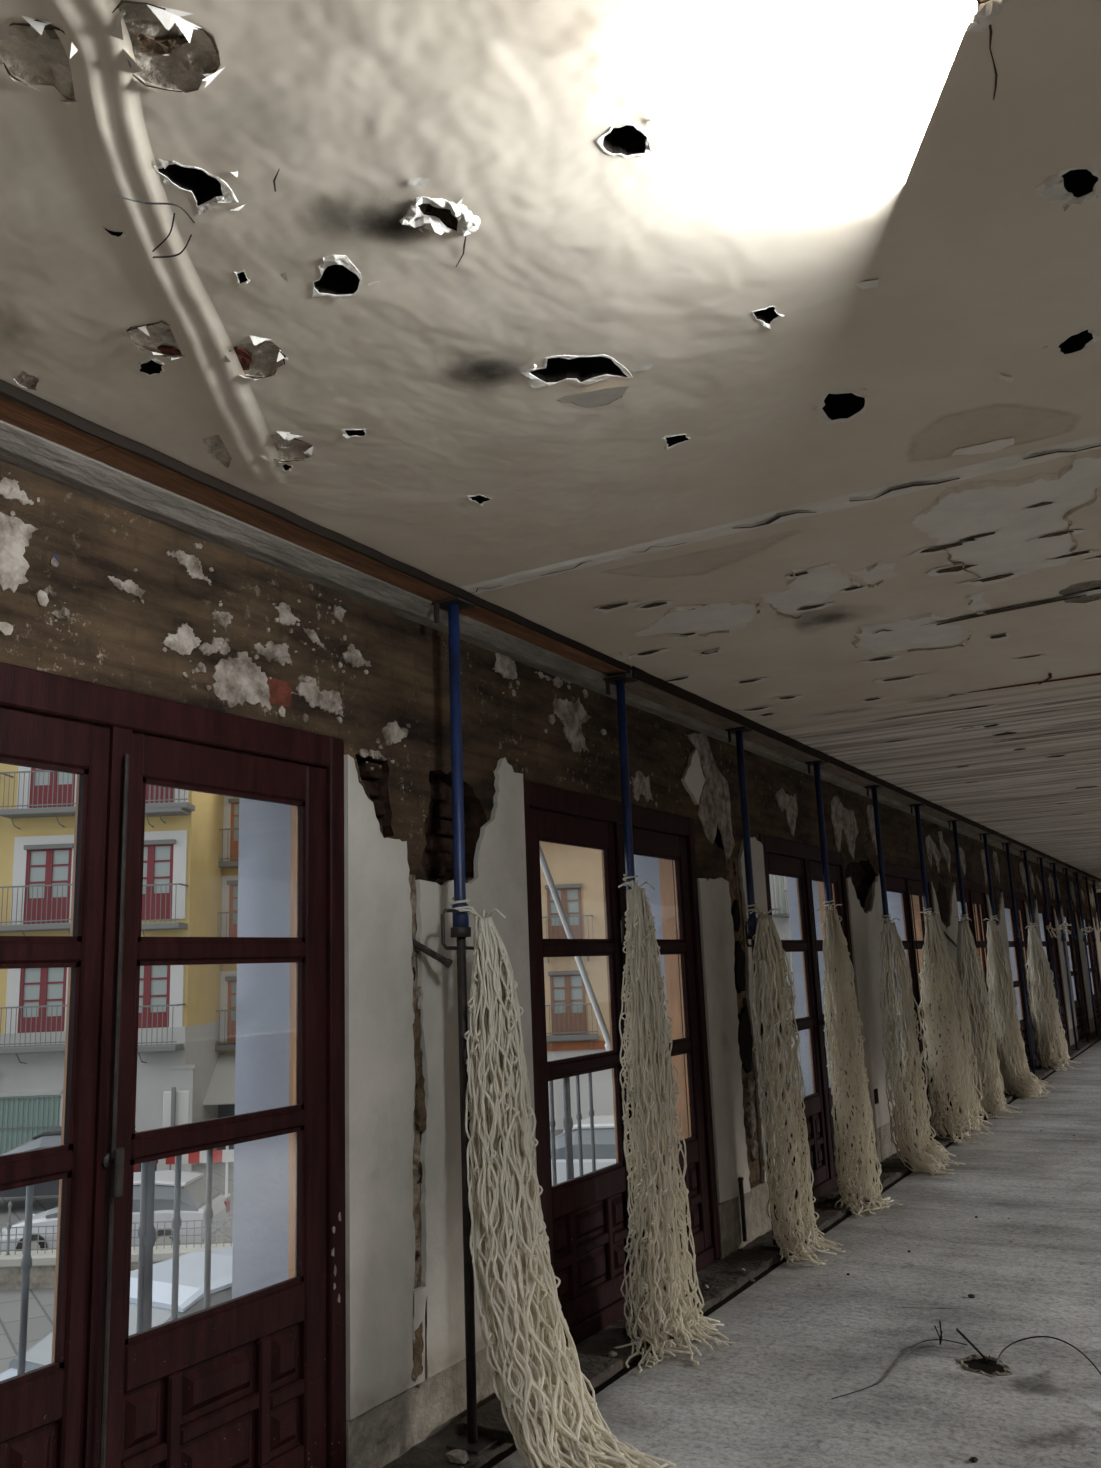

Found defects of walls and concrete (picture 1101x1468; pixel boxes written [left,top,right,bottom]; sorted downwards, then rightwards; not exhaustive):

spalling [0,16,78,104]
spalling [112,0,225,93]
spalling [123,319,185,360]
spalling [225,335,289,380]
peeling [908,450,1101,615]
peeling [181,660,211,691]
flaking render [267,677,308,723]
peeling [254,599,346,660]
peeling [592,562,868,662]
peeling [852,612,1011,702]
spalling [355,724,411,837]
spalling [421,770,487,883]